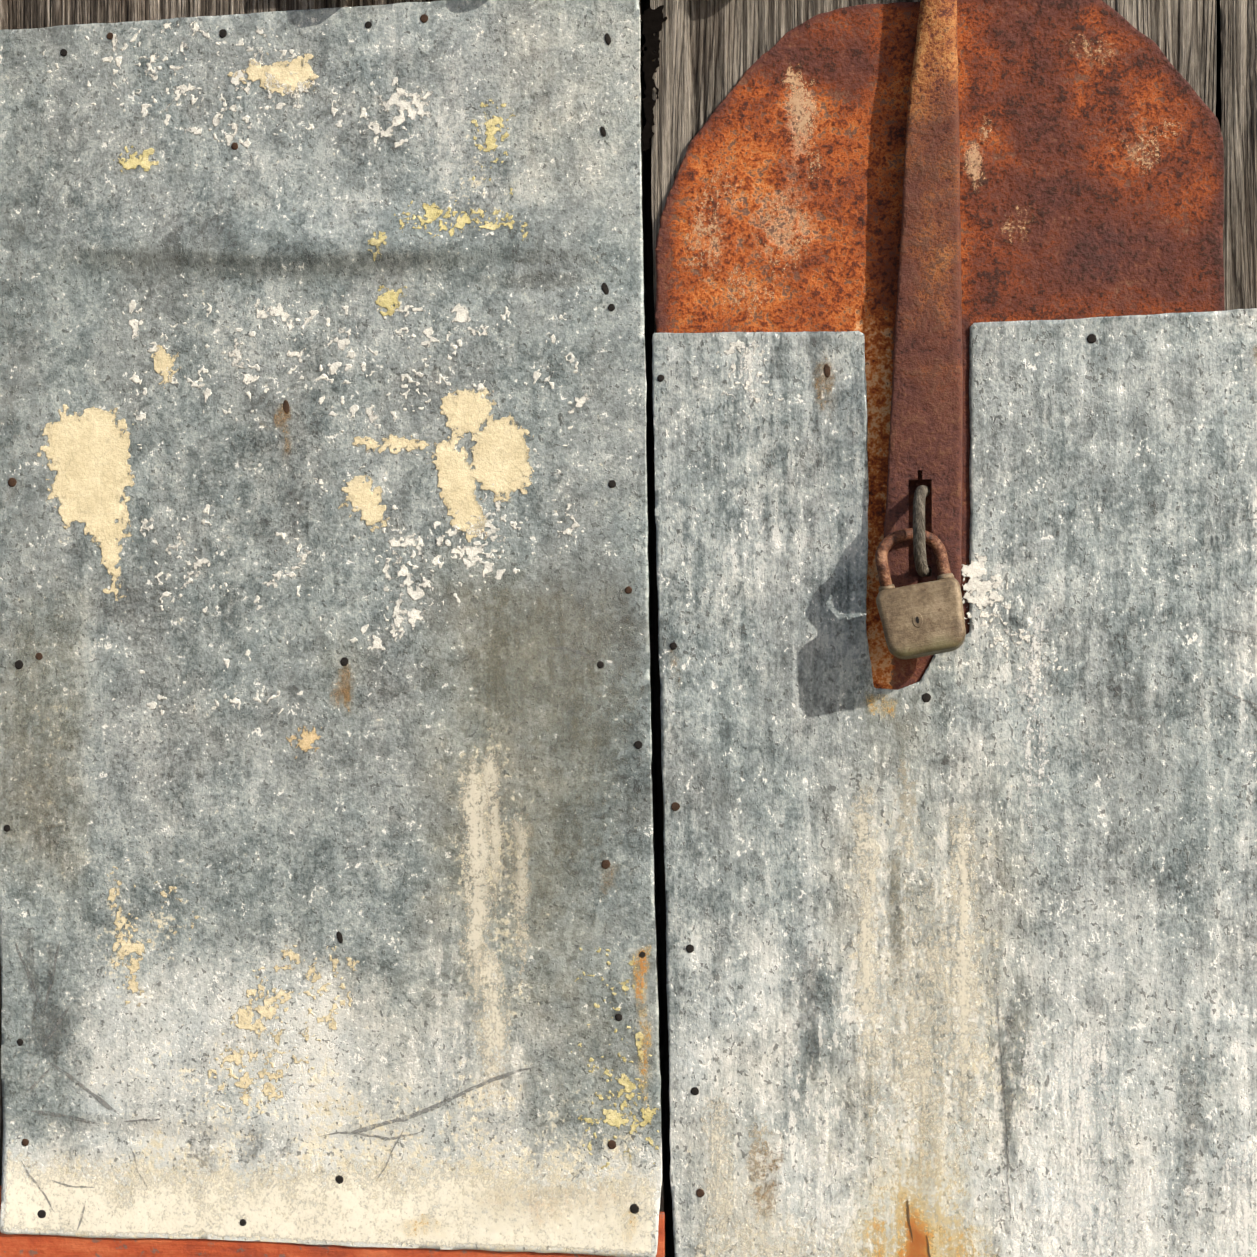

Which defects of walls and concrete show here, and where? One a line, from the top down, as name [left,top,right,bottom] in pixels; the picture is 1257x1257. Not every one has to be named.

peeling [72,21,433,153]
peeling [118,146,159,172]
peeling [471,99,515,181]
peeling [394,188,528,241]
peeling [524,366,554,389]
peeling [568,393,588,430]
peeling [37,286,539,650]
peeling [209,685,303,715]
peeling [105,866,199,1007]
peeling [202,945,359,1126]
peeling [571,947,659,1168]
rust [859,1162,989,1257]